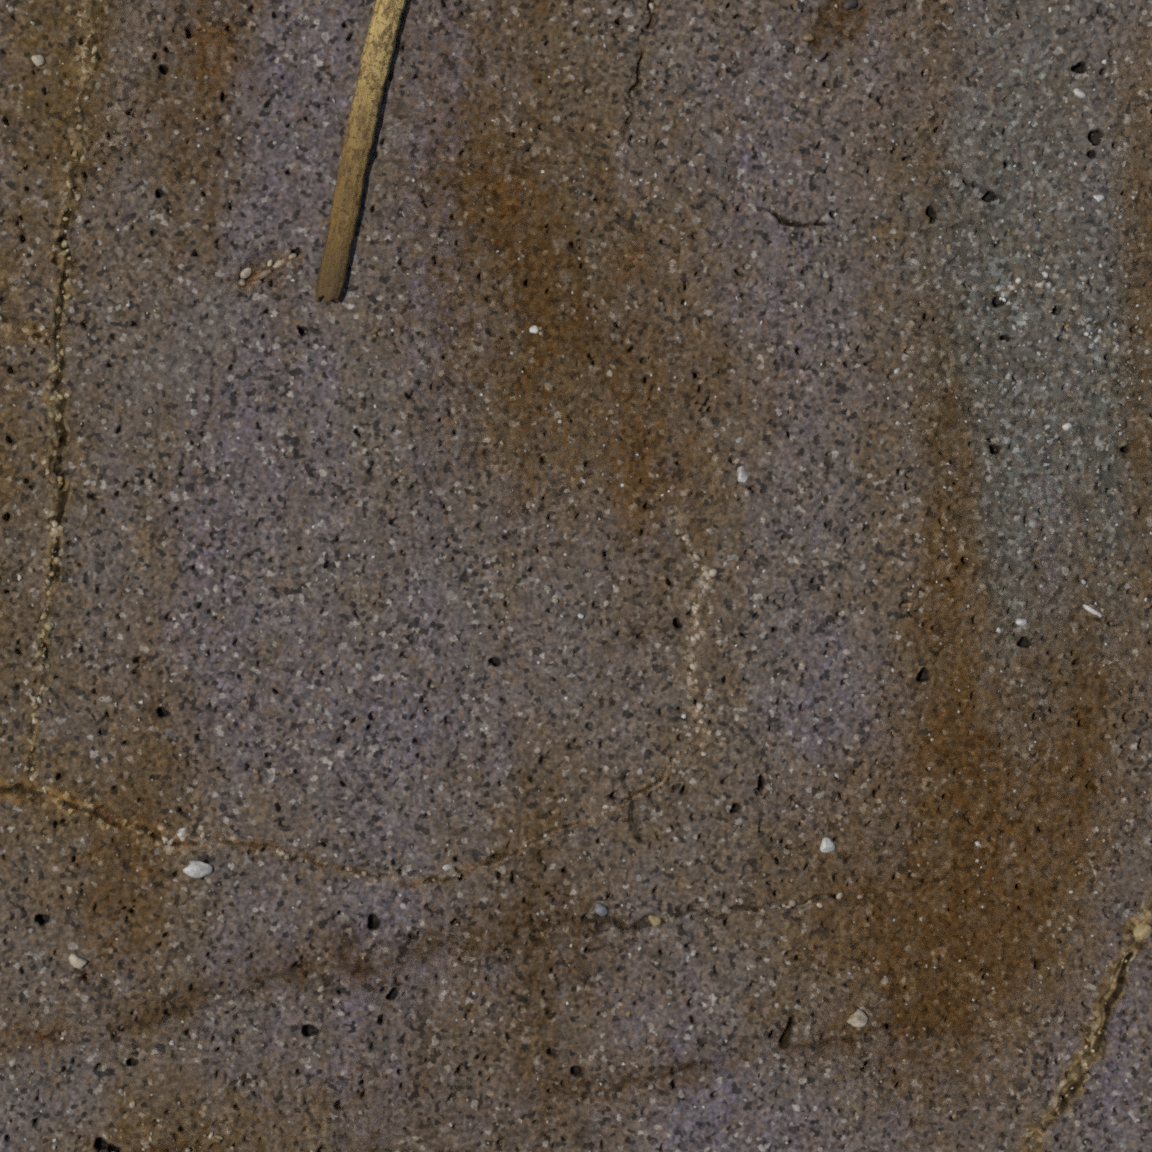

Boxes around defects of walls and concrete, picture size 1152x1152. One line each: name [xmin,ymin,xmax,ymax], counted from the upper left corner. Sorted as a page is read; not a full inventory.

crack [0,0,718,888]
crack [1022,895,1152,1152]